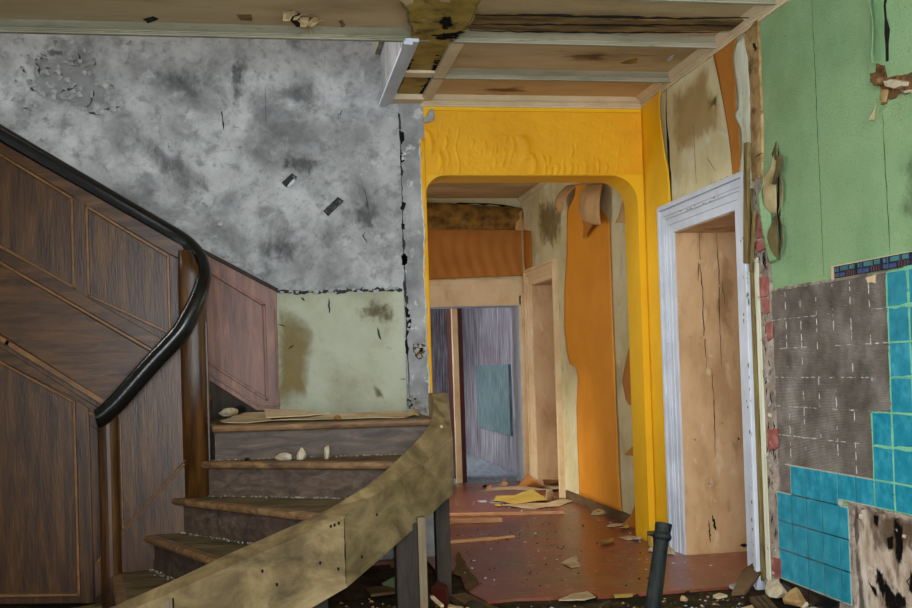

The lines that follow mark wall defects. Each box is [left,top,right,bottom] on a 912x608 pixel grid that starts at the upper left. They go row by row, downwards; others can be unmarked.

peeling [12,40,123,115]
peeling [398,0,481,94]
spalling [868,63,912,121]
water stain [368,305,391,319]
spalling [406,139,430,415]
peeling [743,20,892,580]
water stain [281,323,307,394]